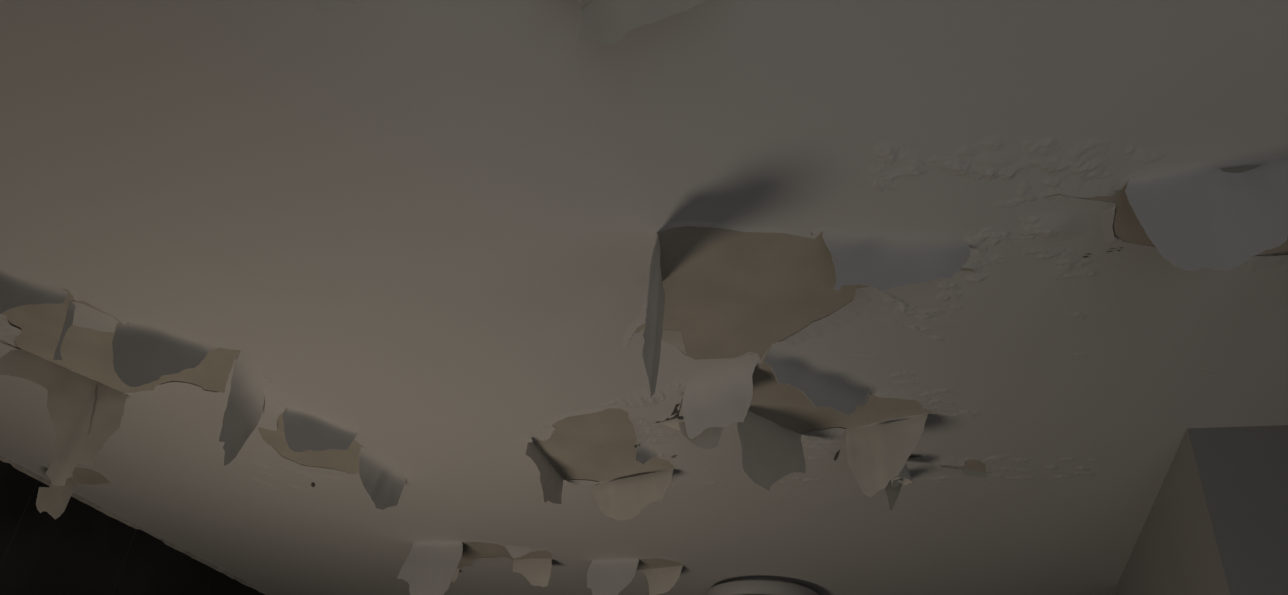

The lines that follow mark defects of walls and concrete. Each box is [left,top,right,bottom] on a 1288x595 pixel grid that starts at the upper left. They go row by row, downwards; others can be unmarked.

peeling [0,267,406,519]
peeling [526,221,984,521]
peeling [397,540,556,595]
peeling [587,557,687,595]